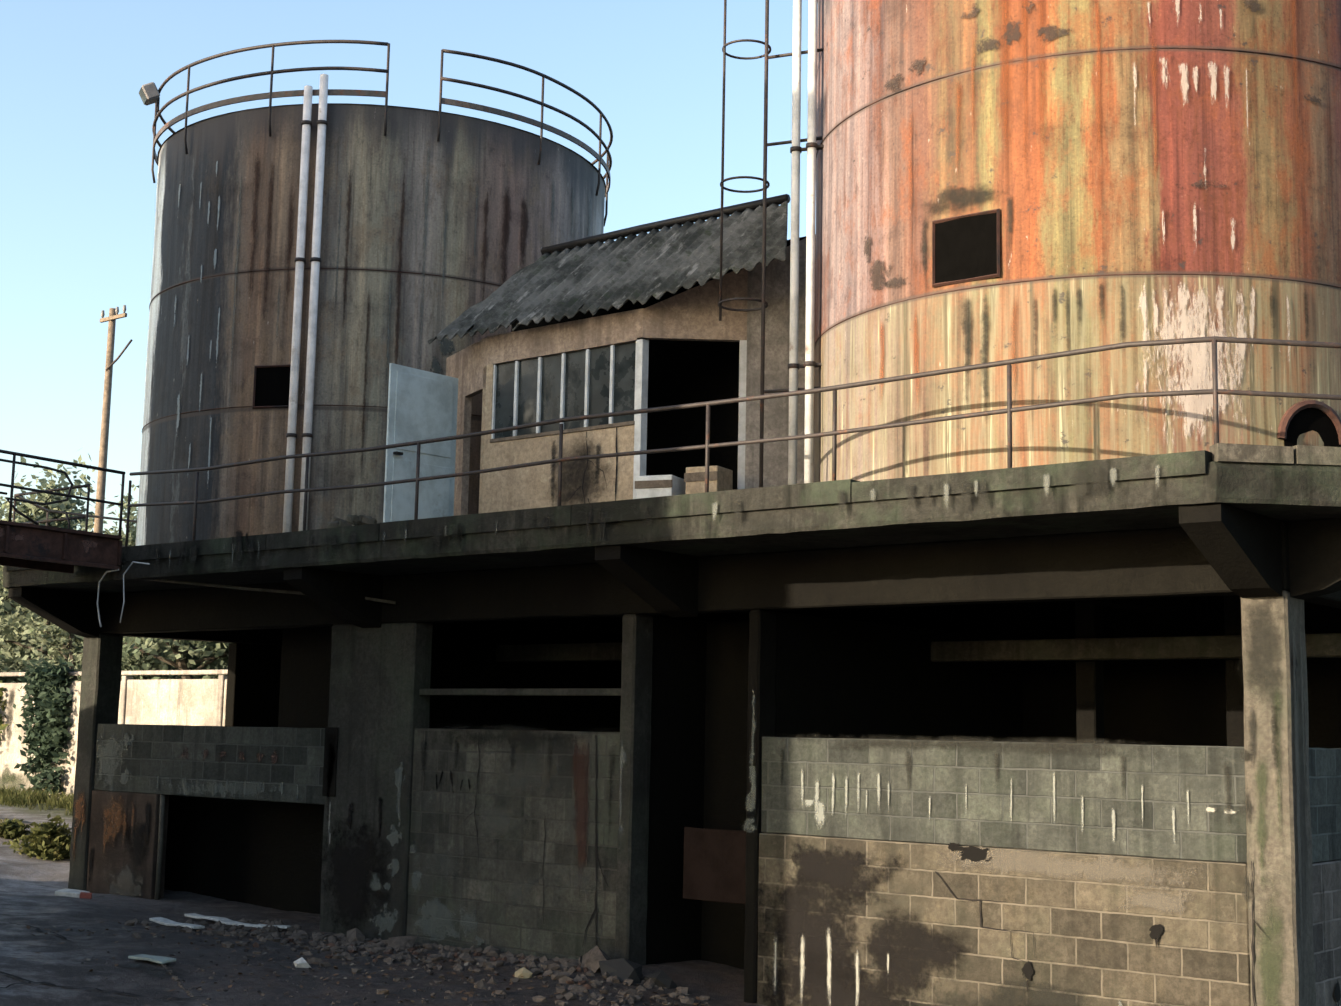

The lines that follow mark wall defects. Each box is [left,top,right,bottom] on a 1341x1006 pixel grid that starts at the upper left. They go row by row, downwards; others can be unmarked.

rust [250,161,274,302]
rust [286,199,294,302]
rust [343,176,351,313]
rust [395,182,405,364]
rust [482,195,529,292]
rust [361,297,370,464]
peeling [1139,285,1255,436]
rust [102,798,134,850]
damp [801,771,889,825]
damp [844,739,1125,819]
damp [1172,791,1189,836]